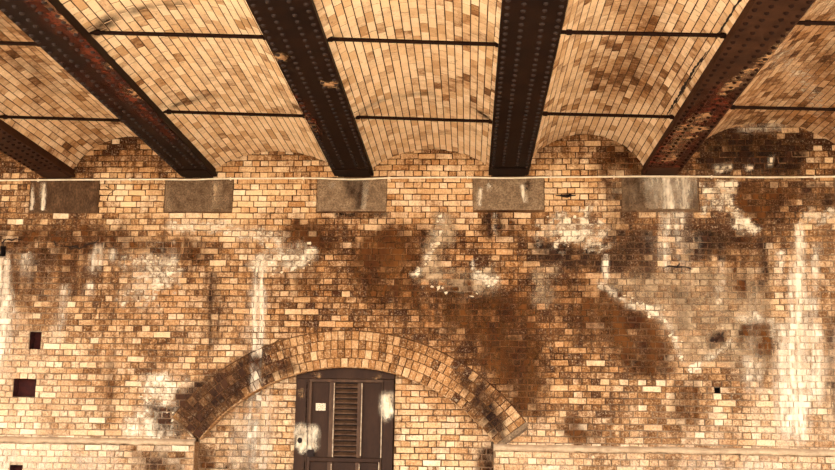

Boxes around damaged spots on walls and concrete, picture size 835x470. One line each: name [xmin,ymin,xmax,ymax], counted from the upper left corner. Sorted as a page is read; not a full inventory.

damp [599,143,641,175]
damp [283,219,337,284]
damp [351,225,440,309]
damp [483,213,514,238]
damp [634,177,689,229]
damp [695,231,769,304]
damp [736,178,834,226]
damp [429,276,544,415]
damp [555,280,669,377]
damp [739,223,835,442]
damp [563,419,592,445]
damp [677,387,699,418]